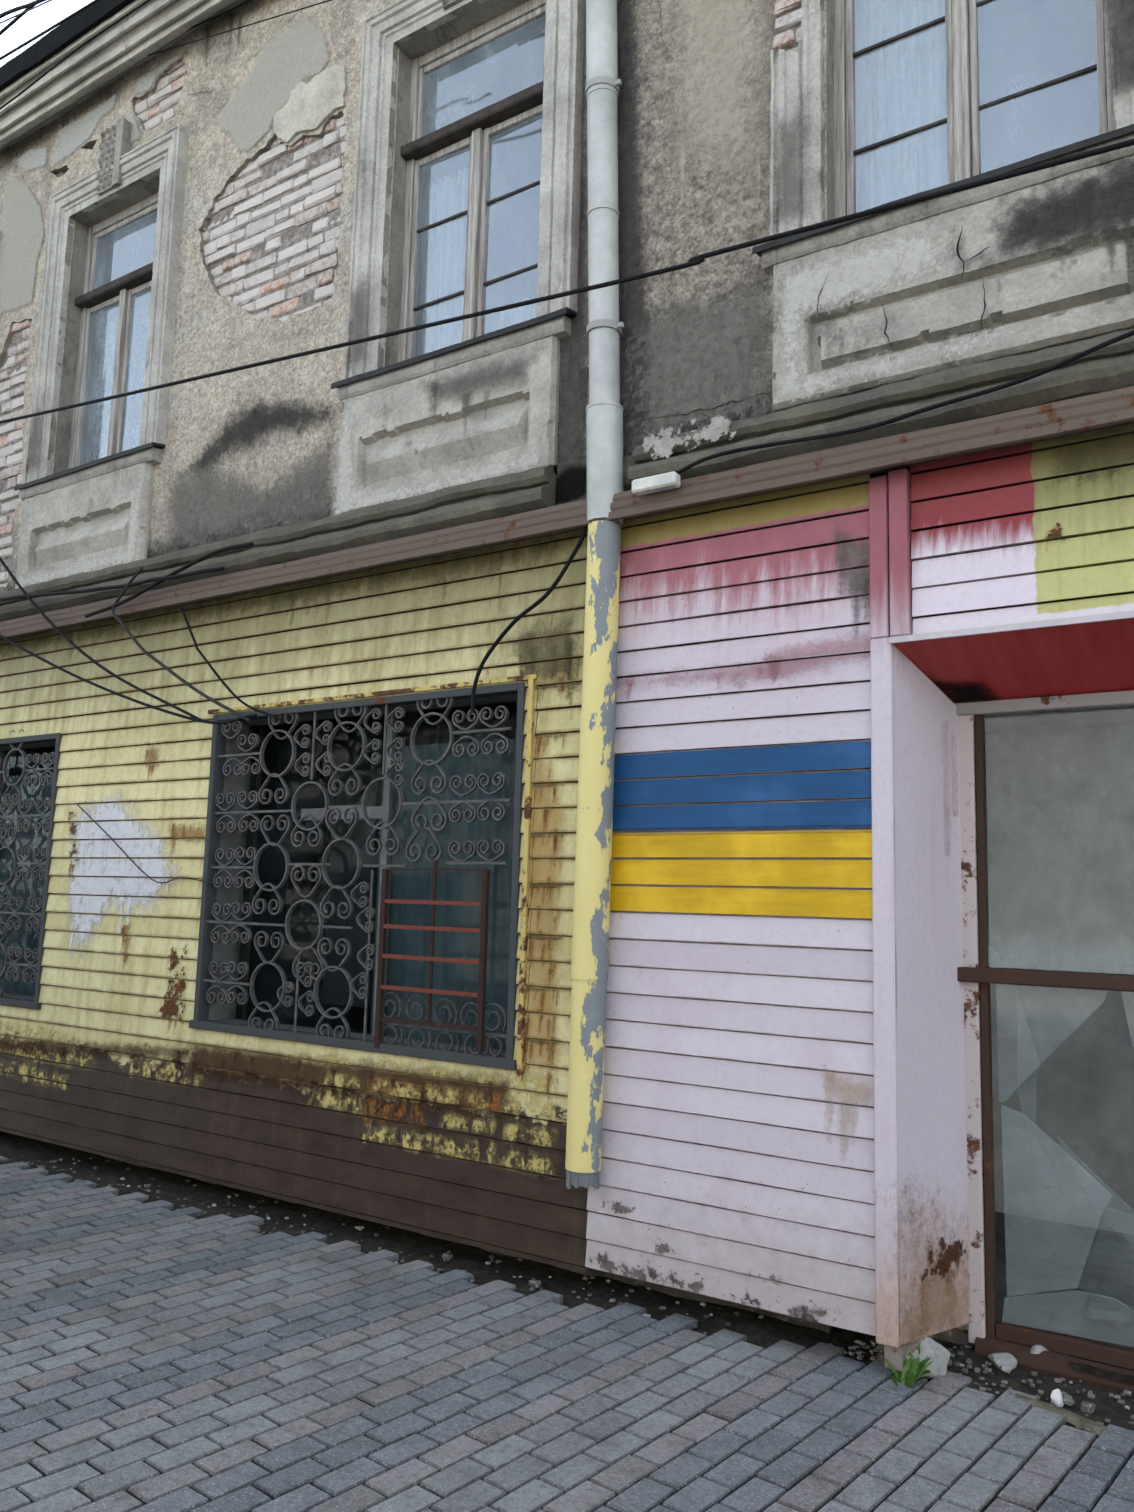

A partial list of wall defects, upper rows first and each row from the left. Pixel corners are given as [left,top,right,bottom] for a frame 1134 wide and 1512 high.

flaking render [202,63,347,321]
water stain [988,158,1134,289]
flaking render [0,320,143,588]
peeling [67,789,177,957]
peeling [0,1023,95,1090]
peeling [122,1044,199,1086]
peeling [299,1053,556,1175]
peeling [602,1200,636,1214]
peeling [586,1239,841,1328]
corrosion [901,1202,967,1346]